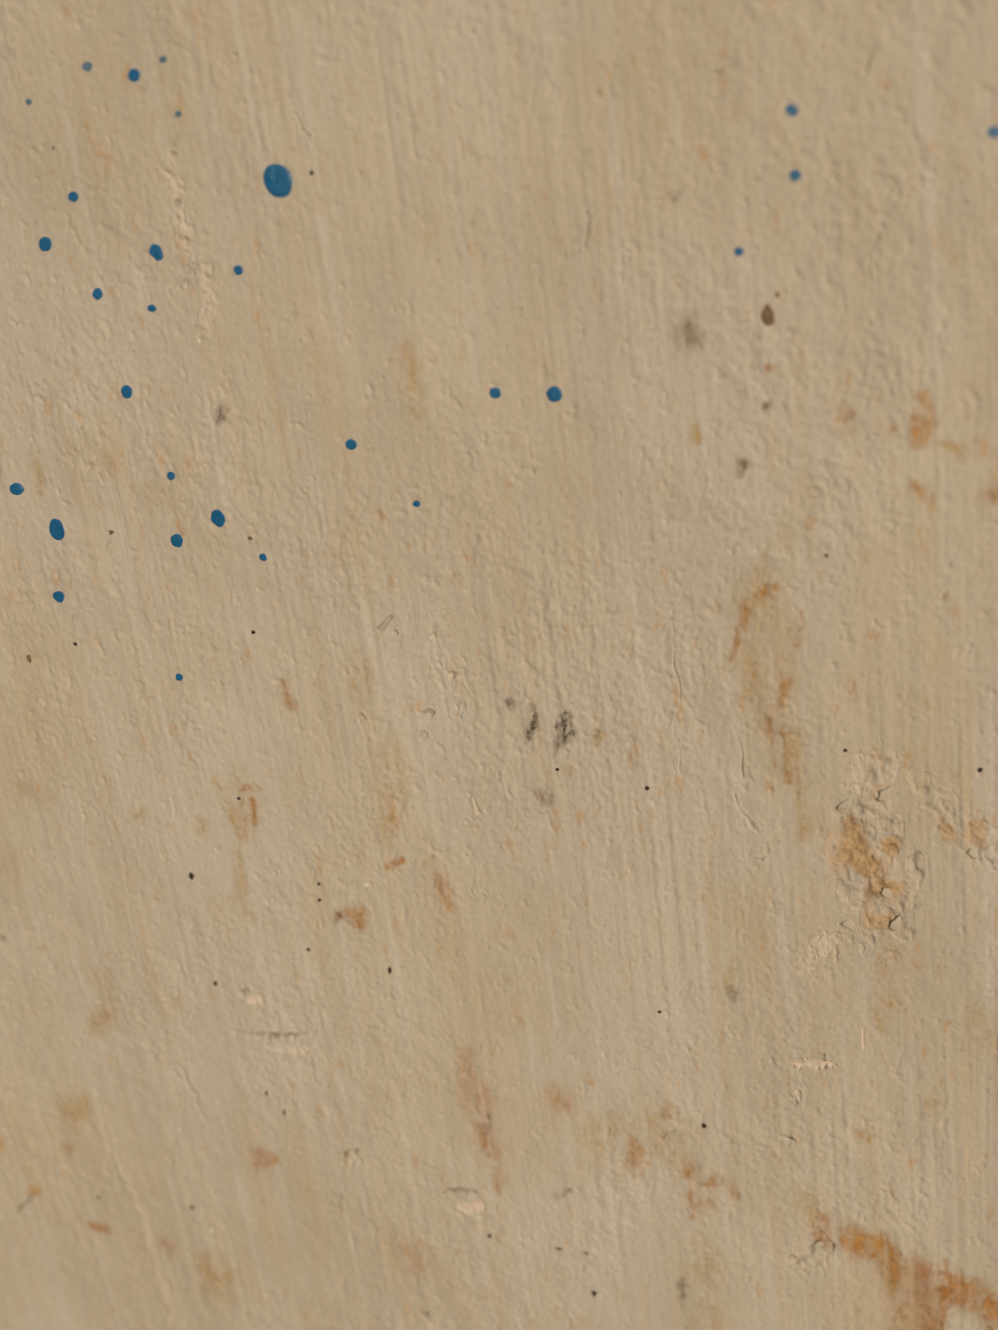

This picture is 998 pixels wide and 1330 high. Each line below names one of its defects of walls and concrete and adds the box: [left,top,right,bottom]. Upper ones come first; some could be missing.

spalling [793,733,998,986]
corrosion [841,1229,900,1289]